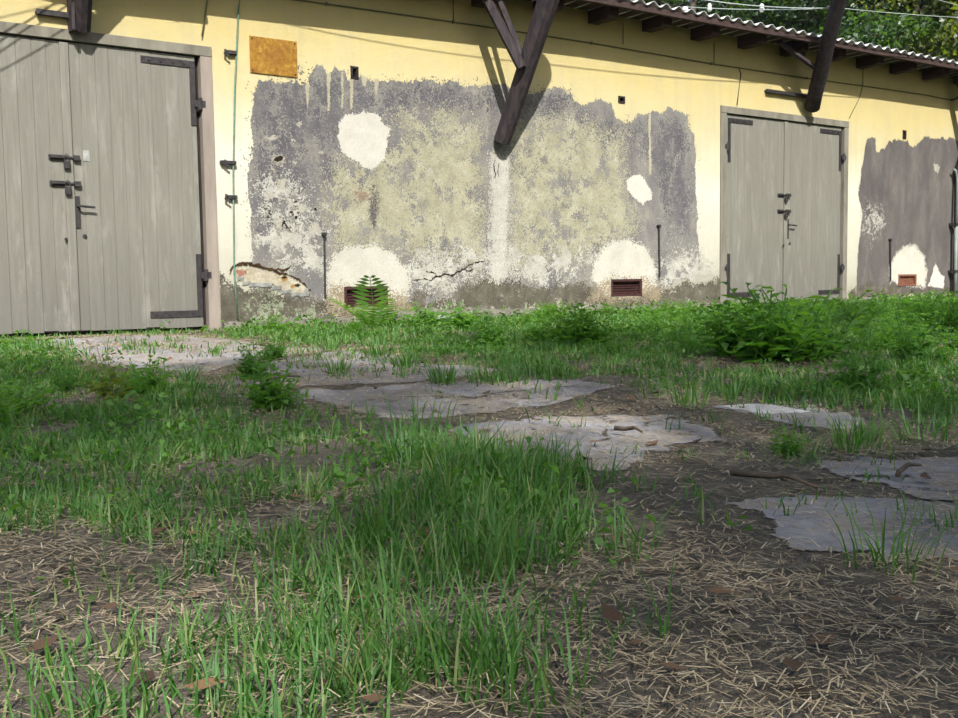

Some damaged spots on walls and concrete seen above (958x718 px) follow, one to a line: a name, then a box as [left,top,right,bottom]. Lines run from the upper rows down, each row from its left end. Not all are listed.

crack [416,261,484,281]
peeling [235,64,701,308]
peeling [856,136,958,297]